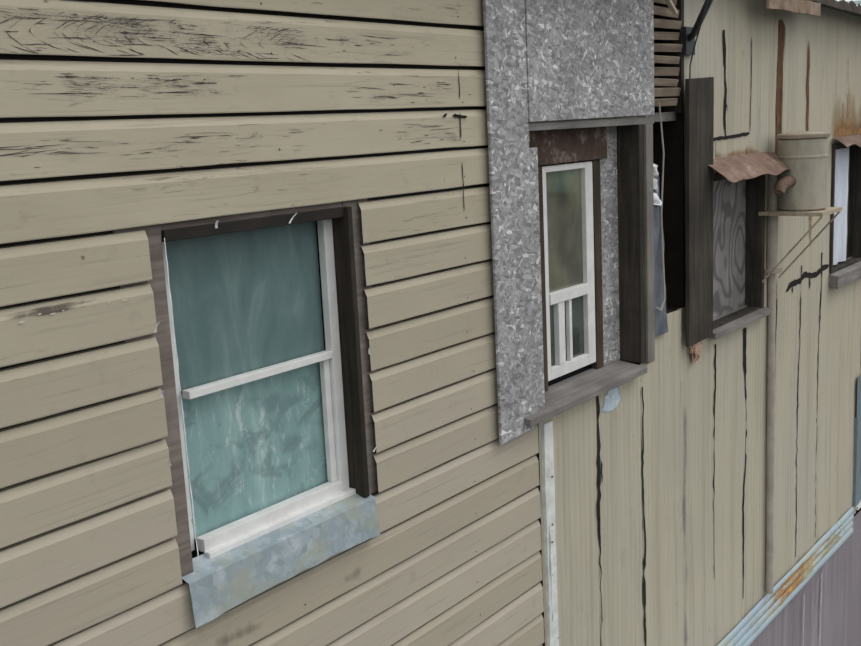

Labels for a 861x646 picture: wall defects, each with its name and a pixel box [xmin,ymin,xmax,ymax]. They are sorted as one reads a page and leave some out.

peeling [0,8,401,61]
crack [595,395,603,634]
crack [710,344,718,522]
crack [741,327,749,596]
rust [774,564,804,602]